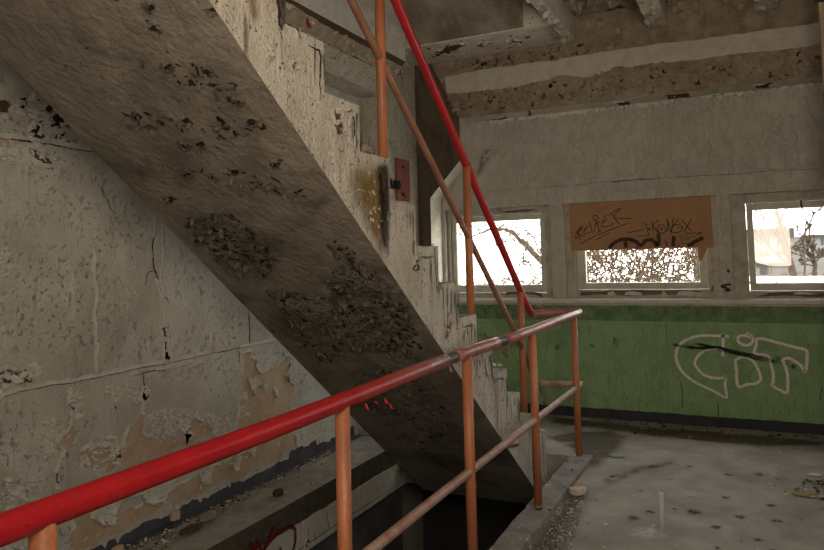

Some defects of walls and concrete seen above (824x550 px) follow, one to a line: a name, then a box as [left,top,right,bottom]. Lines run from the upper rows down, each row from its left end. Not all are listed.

peeling [424,29,548,61]
peeling [444,23,820,93]
flaking render [0,89,89,169]
crack [0,133,95,152]
peeling [118,111,207,153]
peeling [159,59,267,140]
peeling [178,161,306,203]
peeling [184,211,277,282]
crack [5,215,278,417]
peeling [265,240,424,367]
peeling [77,348,296,478]
peeling [70,432,298,550]